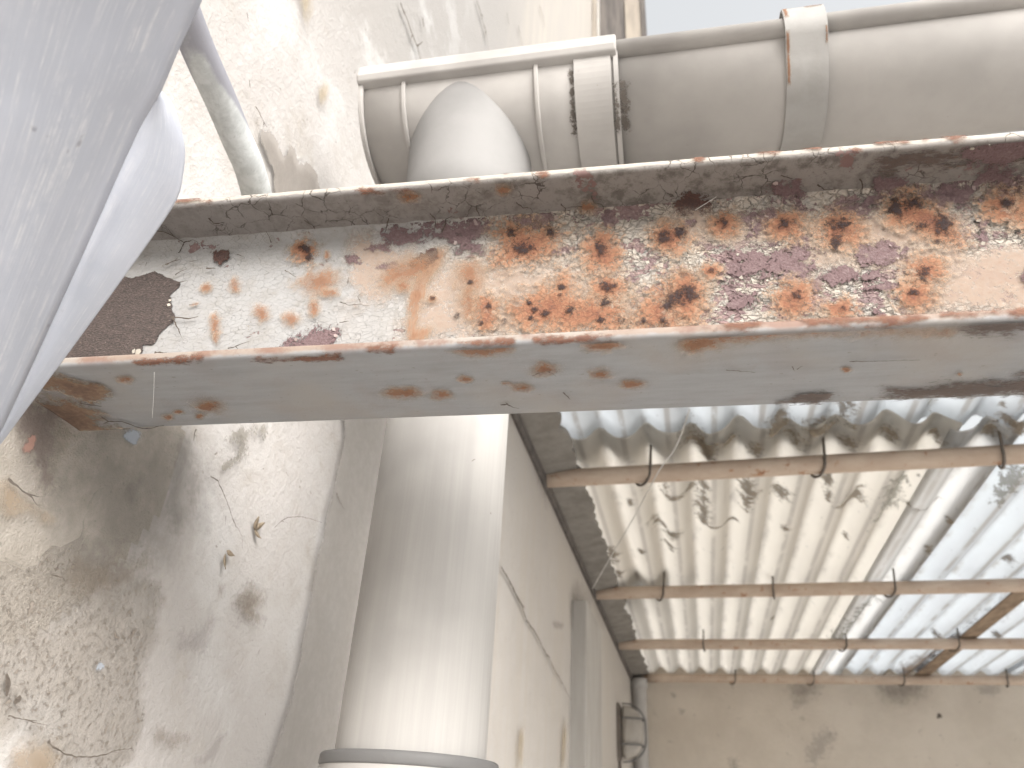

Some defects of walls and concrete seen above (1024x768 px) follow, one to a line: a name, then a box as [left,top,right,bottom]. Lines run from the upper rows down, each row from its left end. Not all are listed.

rust [212,249,230,265]
rust [282,182,1024,357]
peeling [715,178,909,313]
peeling [65,271,181,358]
rust [211,313,221,342]
rust [255,304,268,320]
rust [132,354,204,366]
rust [255,353,342,364]
rust [36,373,132,431]
rust [163,401,219,420]
rust [385,387,452,400]
water stain [222,424,268,471]